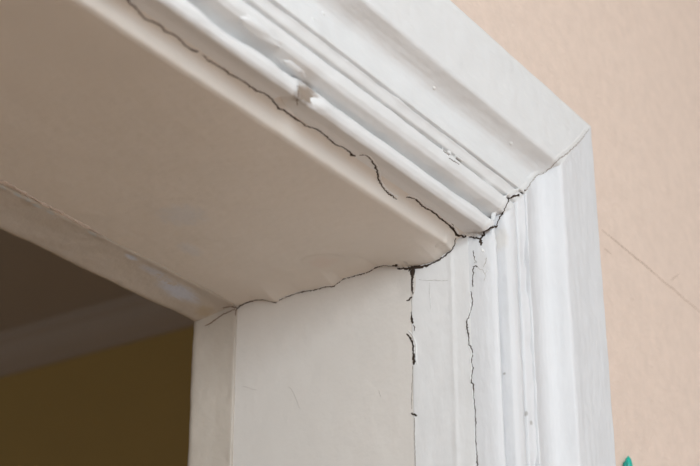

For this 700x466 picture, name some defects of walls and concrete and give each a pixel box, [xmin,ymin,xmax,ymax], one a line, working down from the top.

crack [127,0,589,466]